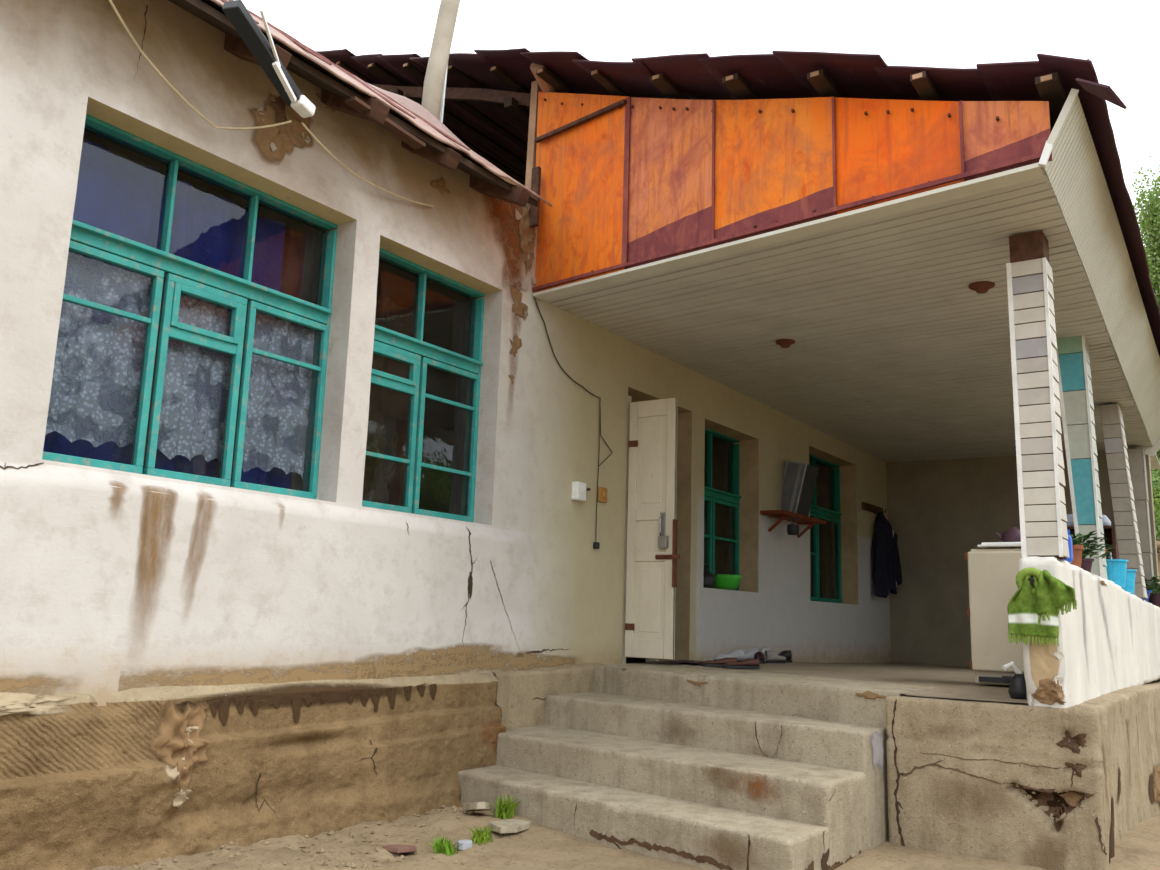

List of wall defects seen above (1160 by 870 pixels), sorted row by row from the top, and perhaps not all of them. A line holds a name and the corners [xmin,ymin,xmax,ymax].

rust [485,196,523,290]
crack [0,462,43,470]
damp [112,484,124,505]
damp [140,489,175,590]
crack [460,527,569,657]
spalling [0,676,71,717]
flaking render [118,645,575,692]
flaking render [1029,636,1071,705]
spalling [149,701,215,808]
crack [892,699,1075,846]
spalling [1003,782,1098,832]
spalling [589,829,733,870]